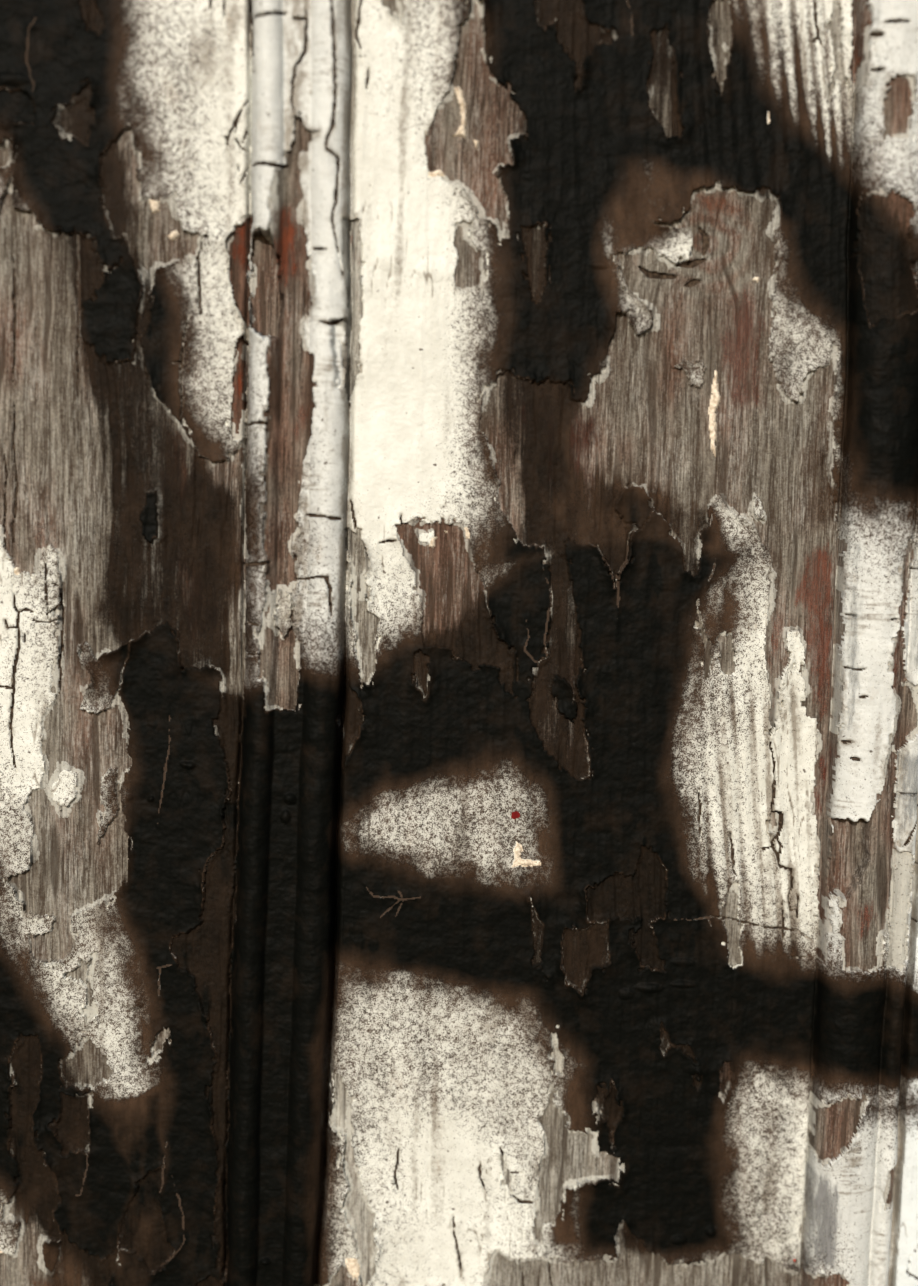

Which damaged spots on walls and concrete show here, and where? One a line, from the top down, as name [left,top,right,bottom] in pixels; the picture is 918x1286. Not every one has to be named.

crack [210,0,369,276]
peeling [425,0,526,291]
peeling [825,0,918,141]
crack [2,261,19,557]
crack [320,318,344,326]
crack [0,563,64,768]
peeling [0,109,326,1154]
peeling [389,516,490,653]
peeling [569,181,918,979]
crack [674,735,804,959]
peeling [484,1025,850,1286]
peeling [808,1089,870,1174]